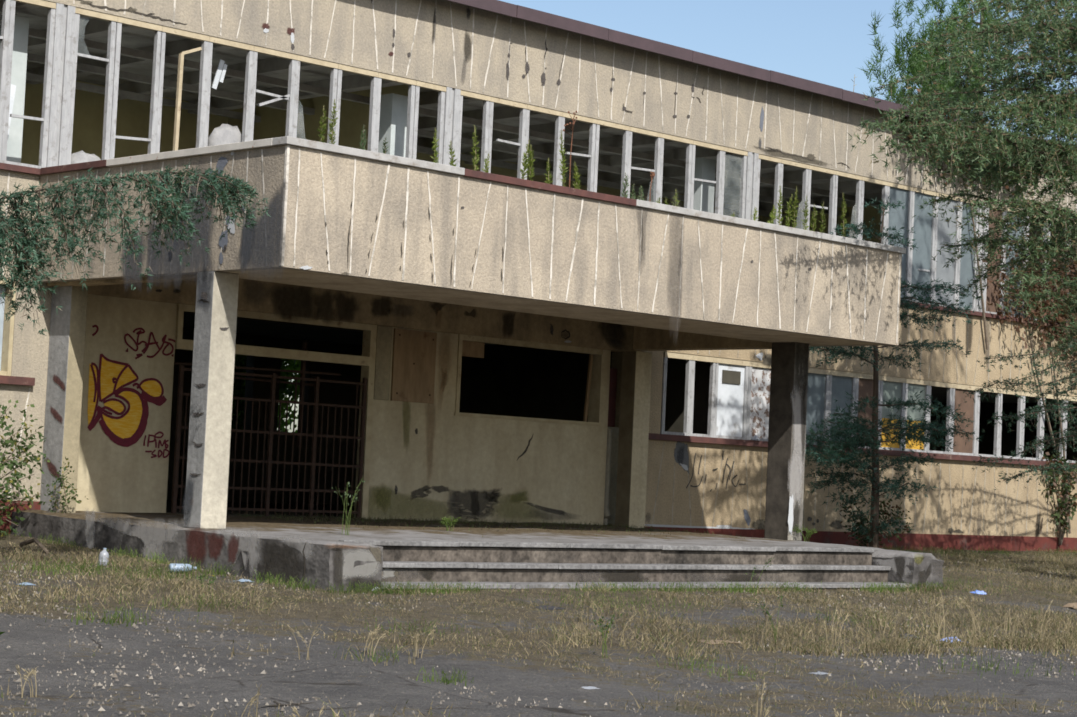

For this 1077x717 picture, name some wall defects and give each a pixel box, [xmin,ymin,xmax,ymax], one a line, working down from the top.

leakage [274,287,355,320]
peeling [674,441,690,474]